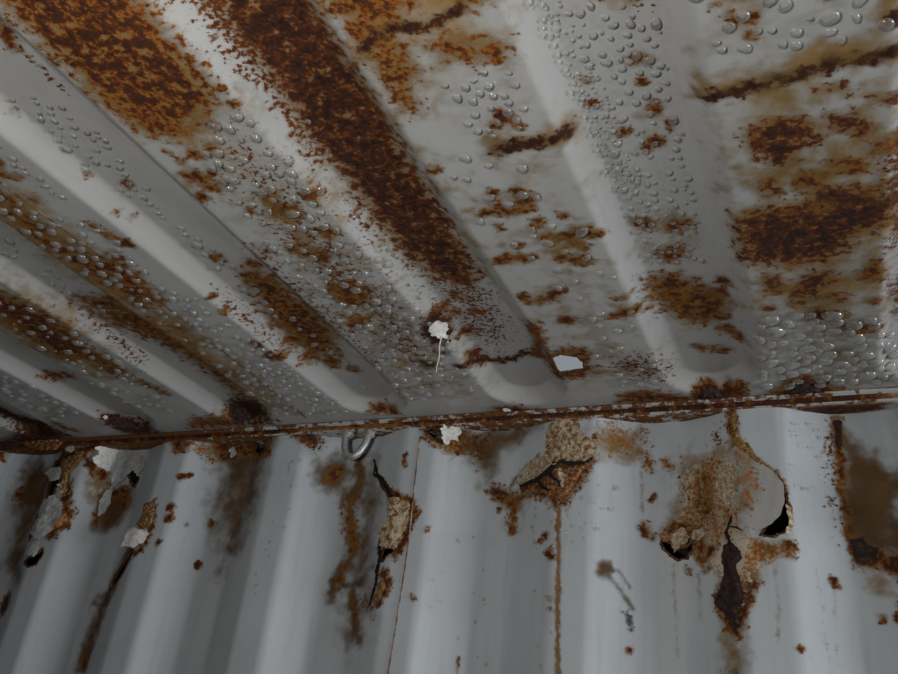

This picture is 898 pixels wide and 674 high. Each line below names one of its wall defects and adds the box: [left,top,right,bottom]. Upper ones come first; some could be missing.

rust [0,0,241,165]
rust [177,0,751,404]
rust [693,0,898,335]
peeling [23,445,159,568]
rust [328,453,380,644]
peeling [374,487,422,608]
rust [0,187,898,579]
rust [536,501,562,674]
peeling [516,417,600,510]
peeling [658,527,706,552]
rust [597,420,801,674]
peeling [724,410,794,538]